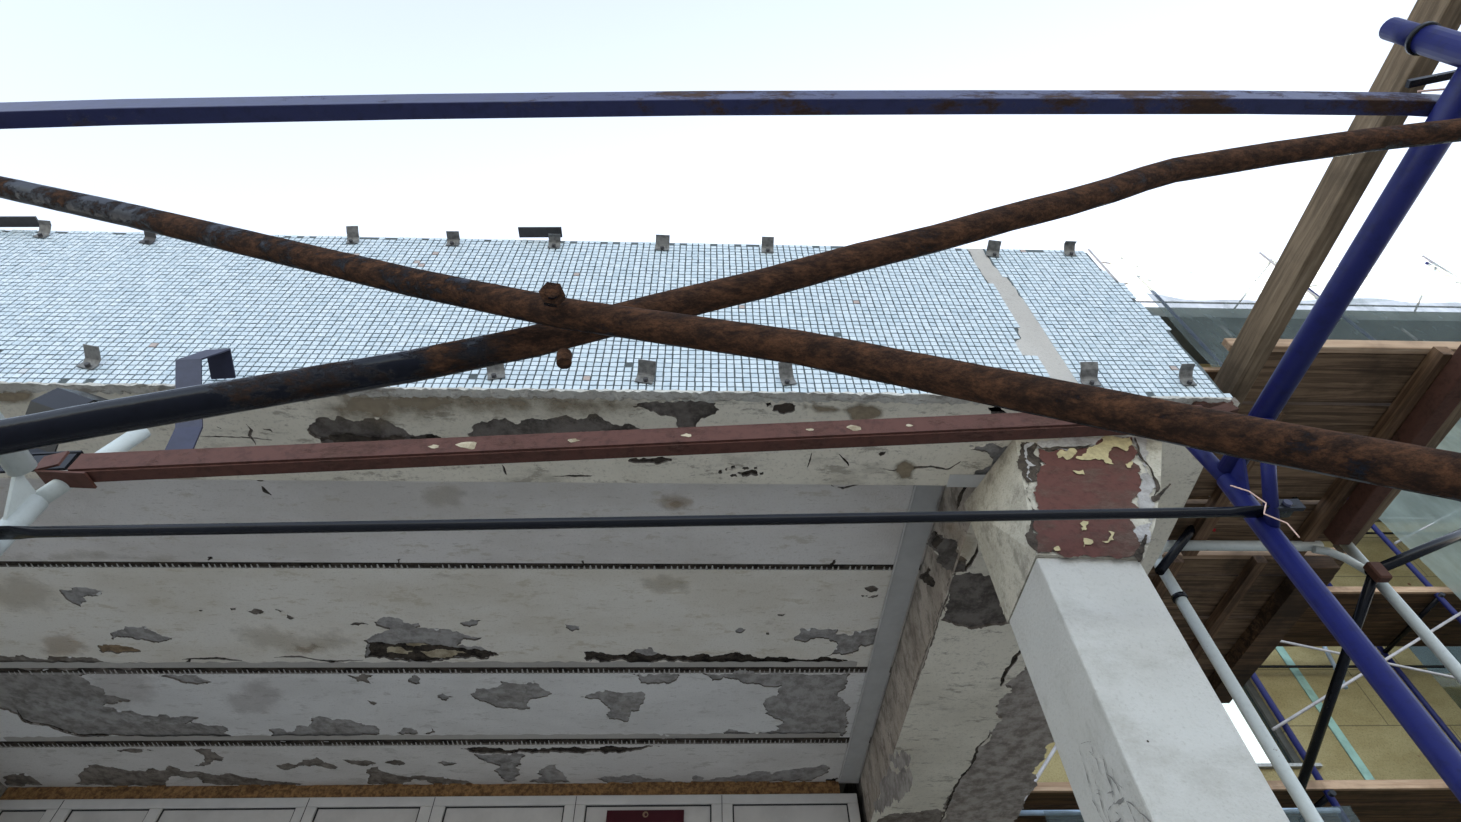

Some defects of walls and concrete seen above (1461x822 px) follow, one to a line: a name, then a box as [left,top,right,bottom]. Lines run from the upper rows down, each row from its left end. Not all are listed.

spalling [308,416,441,443]
spalling [469,400,718,437]
spalling [969,436,1171,562]
peeling [60,587,101,605]
spalling [919,531,1006,627]
peeling [0,626,470,786]
peeling [352,617,497,683]
peeling [472,681,550,709]
peeling [468,734,675,783]
peeling [585,628,877,735]
spalling [873,650,1054,822]